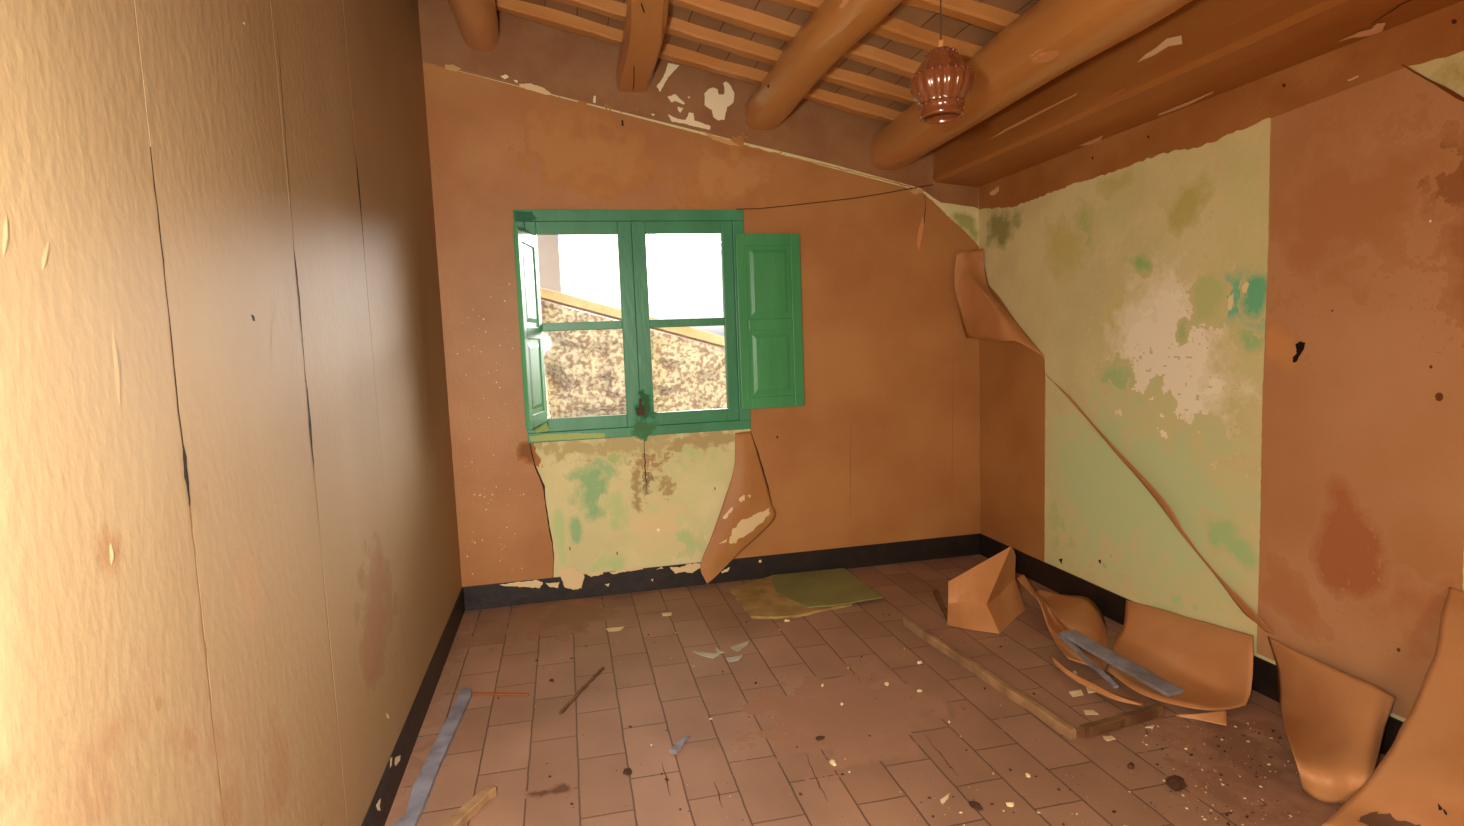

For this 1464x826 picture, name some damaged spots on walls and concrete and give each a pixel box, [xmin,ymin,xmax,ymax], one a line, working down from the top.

crack [150,147,225,826]
crack [276,23,341,755]
peeling [501,563,700,590]
peeling [651,63,925,195]
leakage [949,51,1464,671]
peeling [1228,281,1249,310]